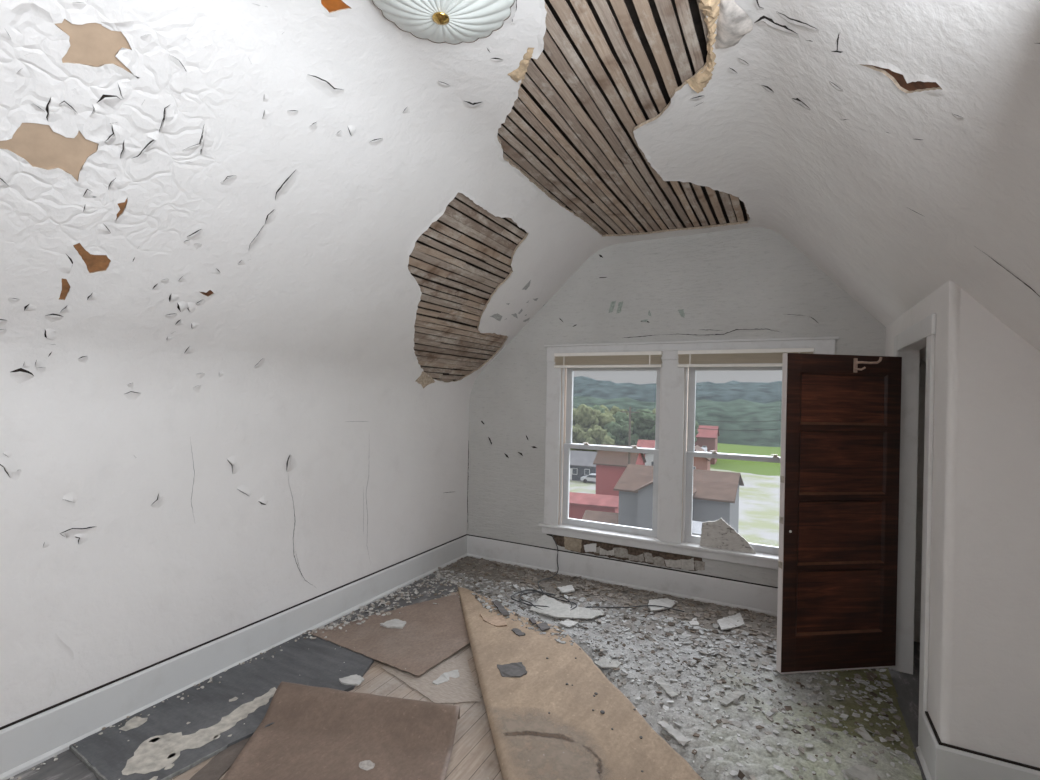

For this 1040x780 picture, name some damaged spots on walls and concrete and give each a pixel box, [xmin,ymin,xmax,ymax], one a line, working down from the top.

peeling [318,0,355,17]
flaking render [531,0,547,59]
peeling [0,0,187,213]
peeling [306,74,344,97]
peeling [182,124,215,165]
flaking render [493,80,753,238]
peeling [95,171,133,235]
peeling [0,240,115,384]
flaking render [405,190,544,384]
crack [286,455,312,585]
flaking render [547,534,705,571]